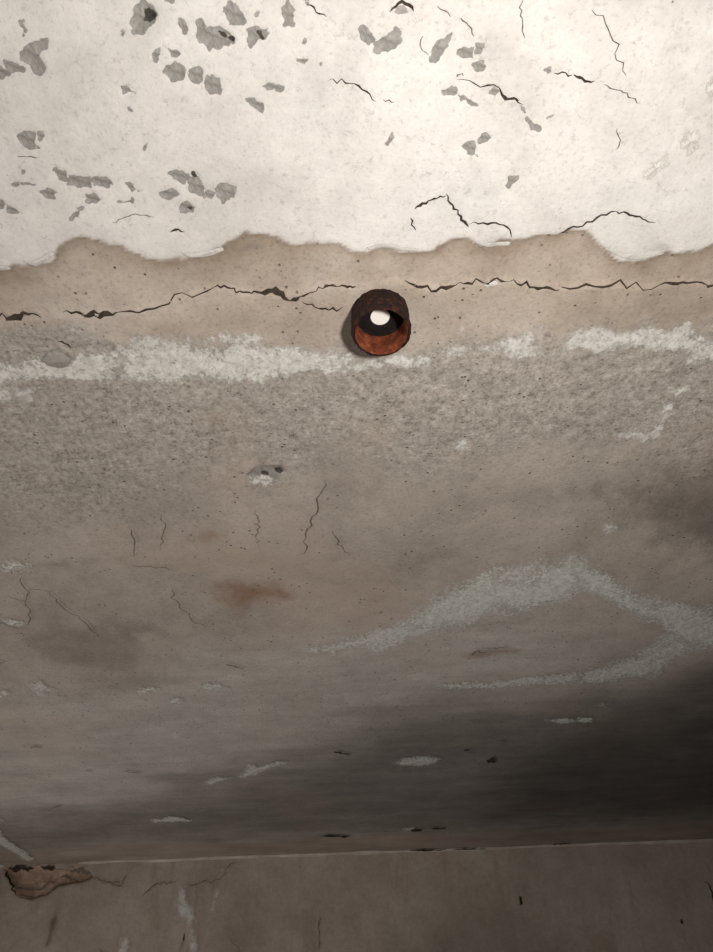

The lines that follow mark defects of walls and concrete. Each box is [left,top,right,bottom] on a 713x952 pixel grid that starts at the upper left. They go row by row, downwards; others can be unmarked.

flaking render [121,0,158,36]
flaking render [178,0,269,52]
flaking render [152,48,222,95]
crack [555,10,637,103]
flaking render [159,169,237,213]
crack [411,195,512,237]
crack [0,284,356,321]
crack [405,277,713,292]
damp [0,332,430,403]
damp [442,327,541,359]
damp [565,320,713,369]
damp [307,554,713,690]